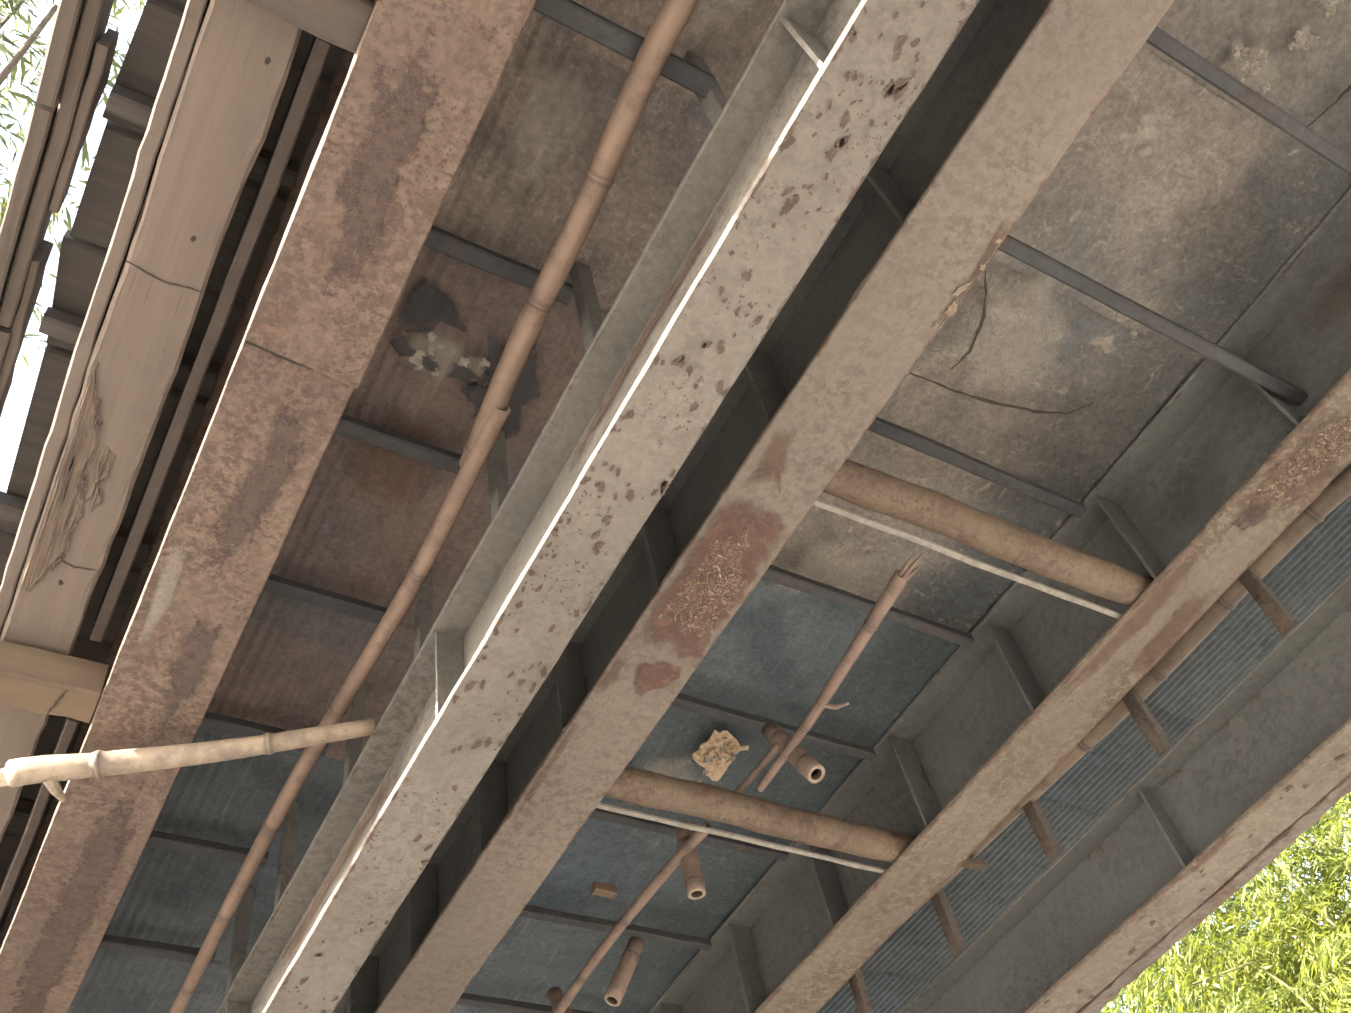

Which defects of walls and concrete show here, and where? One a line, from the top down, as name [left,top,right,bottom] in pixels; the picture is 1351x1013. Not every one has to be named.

crack [1308,84,1351,127]
peeling [390,331,491,408]
crack [910,267,1093,414]
corrosion [603,503,784,695]